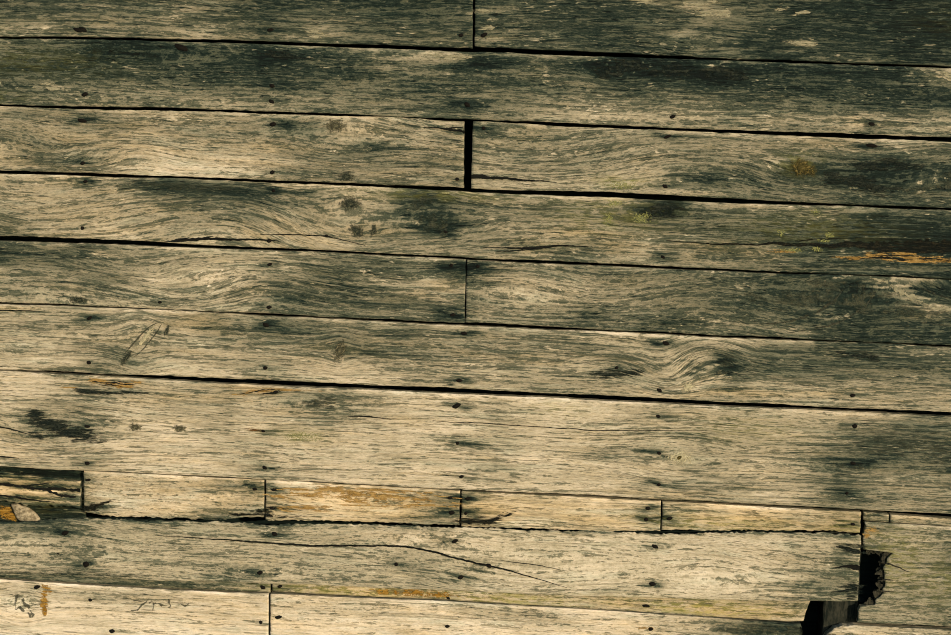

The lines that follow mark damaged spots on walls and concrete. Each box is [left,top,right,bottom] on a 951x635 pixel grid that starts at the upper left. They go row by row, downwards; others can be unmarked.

corrosion [833,252,951,263]
leakage [22,407,107,444]
corrosion [0,505,16,521]
crack [157,535,567,588]
corrosion [40,584,52,616]